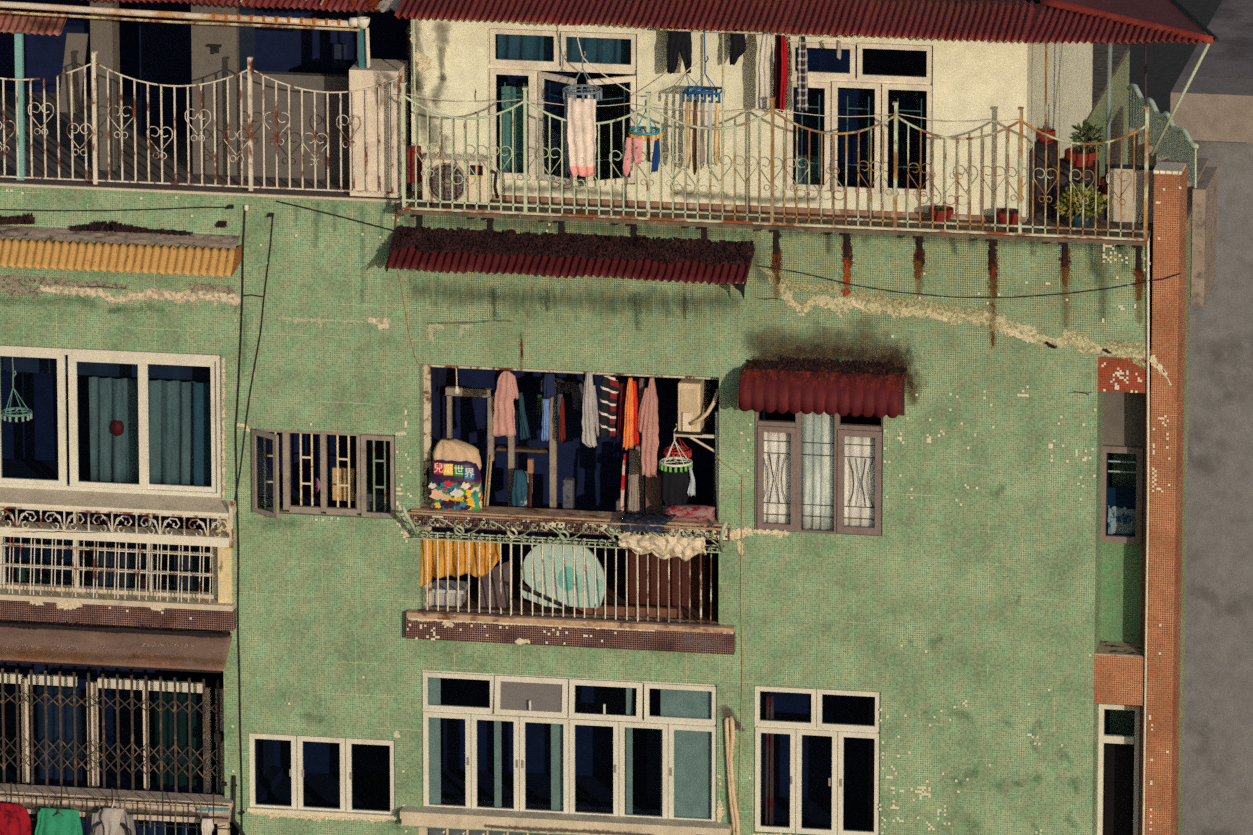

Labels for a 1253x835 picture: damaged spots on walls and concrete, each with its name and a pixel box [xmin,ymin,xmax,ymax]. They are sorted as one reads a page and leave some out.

corrosion [771,233,782,284]
corrosion [842,233,853,295]
corrosion [913,236,925,279]
corrosion [986,239,999,312]
corrosion [1059,246,1071,286]
corrosion [1131,246,1145,301]
spalling [757,263,1172,393]
damp [756,336,916,401]
spalling [672,525,790,555]
spalling [407,618,655,645]